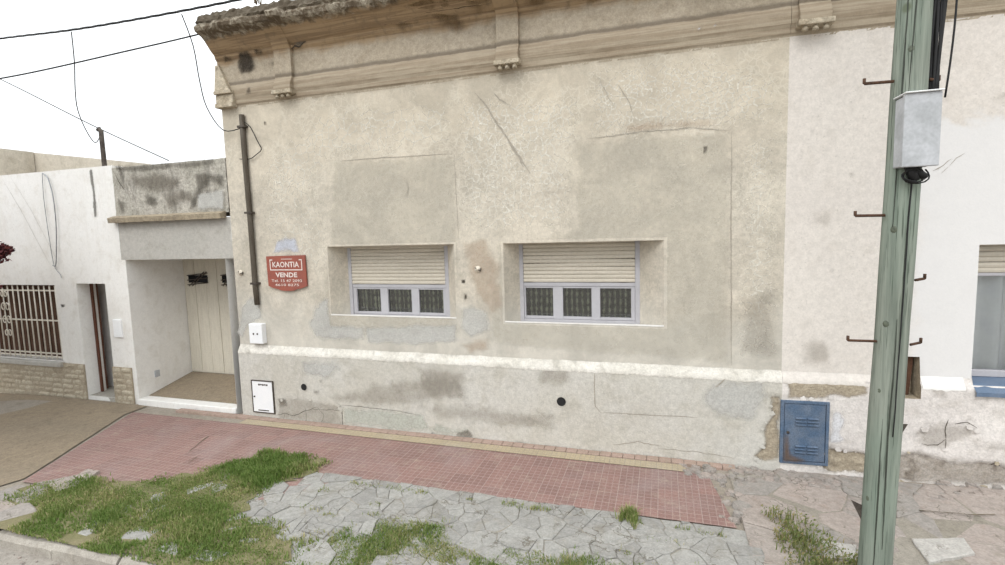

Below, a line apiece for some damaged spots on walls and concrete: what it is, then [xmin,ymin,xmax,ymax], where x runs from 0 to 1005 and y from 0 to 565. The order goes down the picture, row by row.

crack [344,65,767,387]
spalling [753,381,870,463]
spalling [817,447,865,476]
spalling [899,449,1005,488]